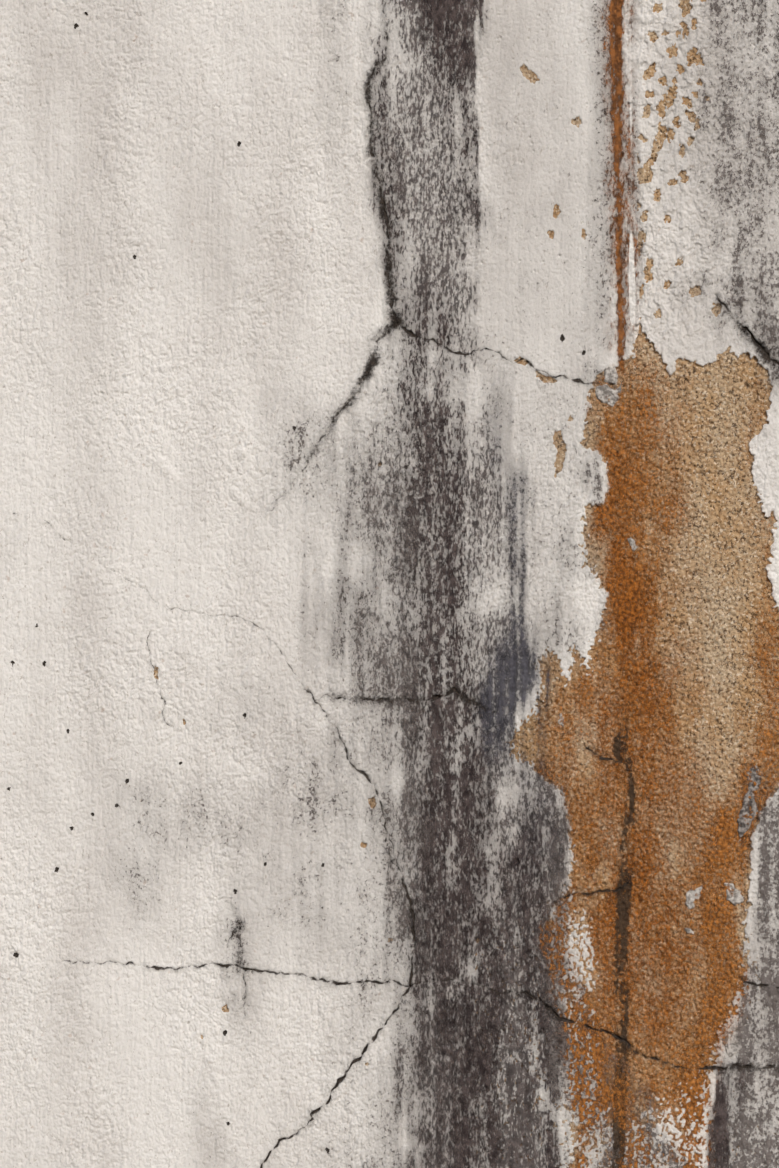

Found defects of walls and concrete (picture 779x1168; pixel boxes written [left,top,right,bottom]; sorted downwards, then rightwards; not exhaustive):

crack [305,4,590,468]
peeling [637,0,710,299]
water stain [679,0,779,383]
crack [703,279,779,365]
water stain [119,784,269,858]
crack [66,650,779,1168]
water stain [275,0,686,1168]
peeling [480,309,779,1168]
corrosion [538,0,779,1168]